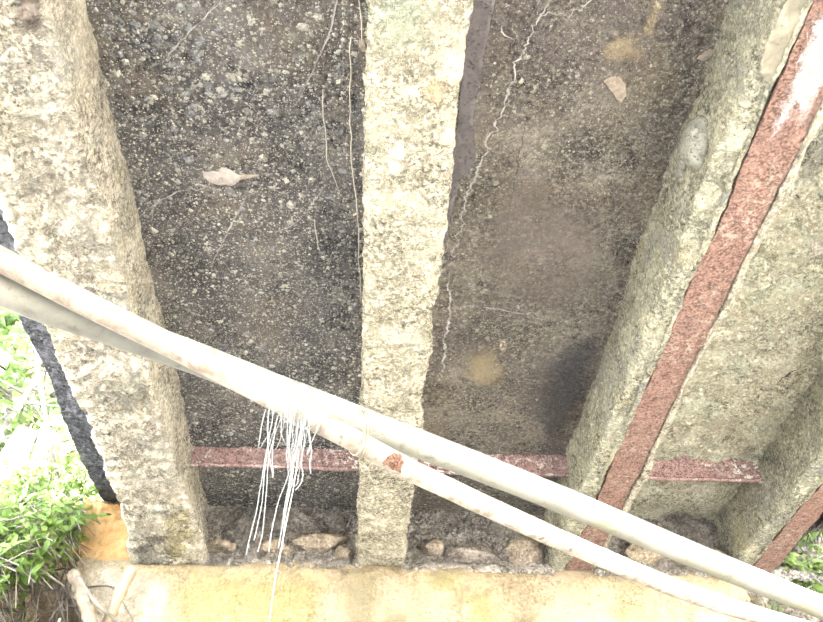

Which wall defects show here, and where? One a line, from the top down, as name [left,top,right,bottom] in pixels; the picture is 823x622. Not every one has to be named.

crack [438,0,591,384]